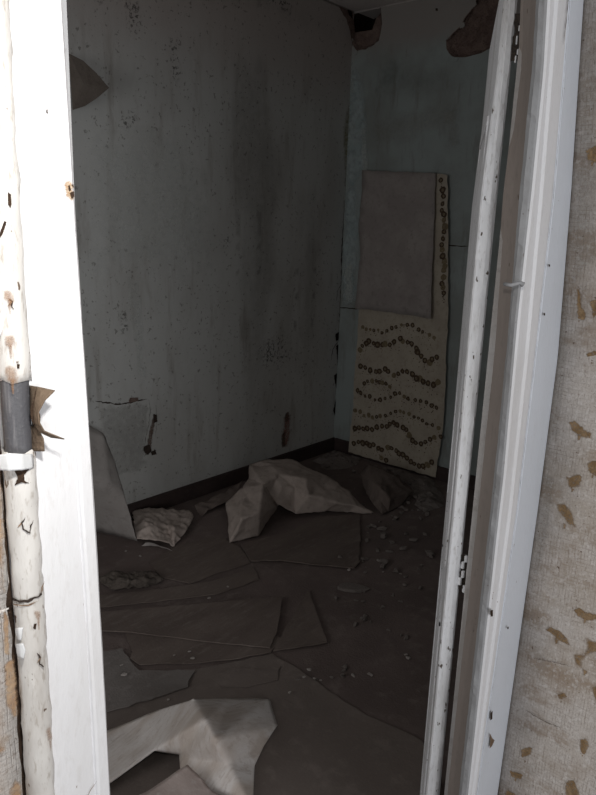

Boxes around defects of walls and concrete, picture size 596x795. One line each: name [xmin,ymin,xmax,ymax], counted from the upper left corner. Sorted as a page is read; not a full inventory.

flaking render [339,7,382,55]
flaking render [443,0,499,62]
corrosion [65,181,74,200]
crack [0,443,45,795]